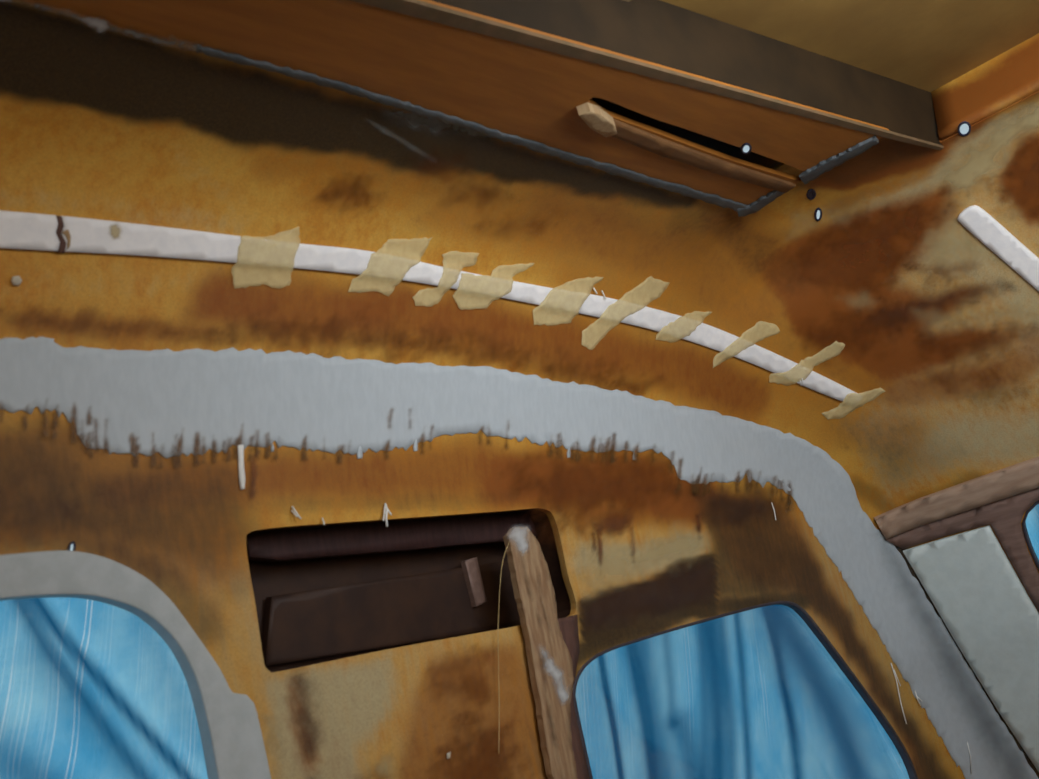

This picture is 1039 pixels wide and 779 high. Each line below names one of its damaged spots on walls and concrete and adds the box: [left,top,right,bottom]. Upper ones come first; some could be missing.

crack [55,216,71,253]
peeling [512,528,527,552]